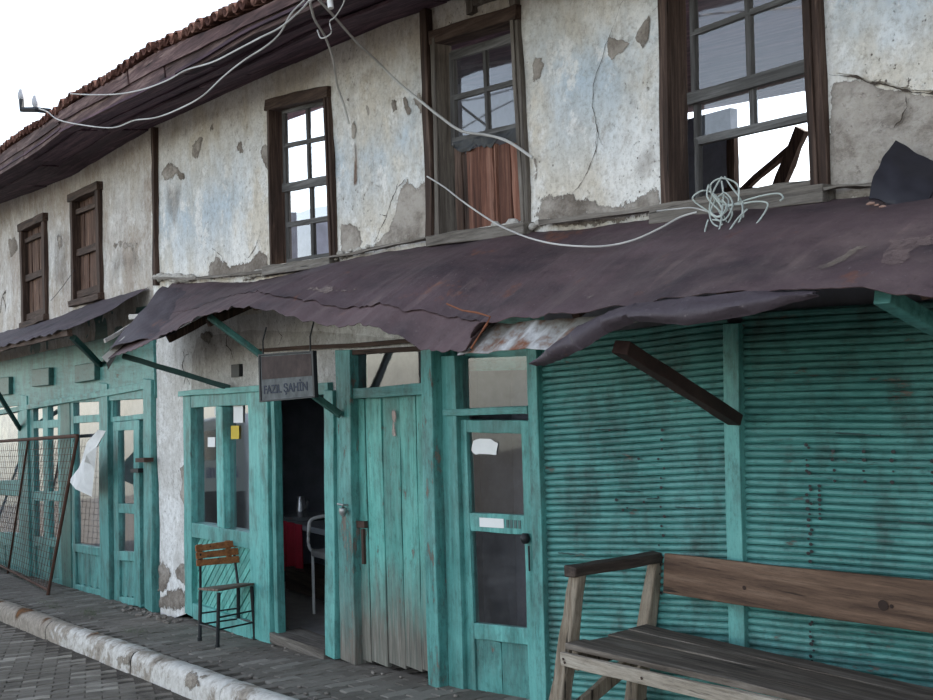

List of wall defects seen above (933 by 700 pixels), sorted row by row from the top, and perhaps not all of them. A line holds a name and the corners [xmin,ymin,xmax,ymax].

crack [574,1,656,191]
crack [829,49,933,127]
flaking render [829,79,933,199]
flaking render [161,163,185,180]
flaking render [208,251,268,280]
flaking render [340,223,363,260]
flaking render [374,179,426,252]
flaking render [536,187,660,228]
flaking render [158,559,185,611]
peeling [185,671,207,690]